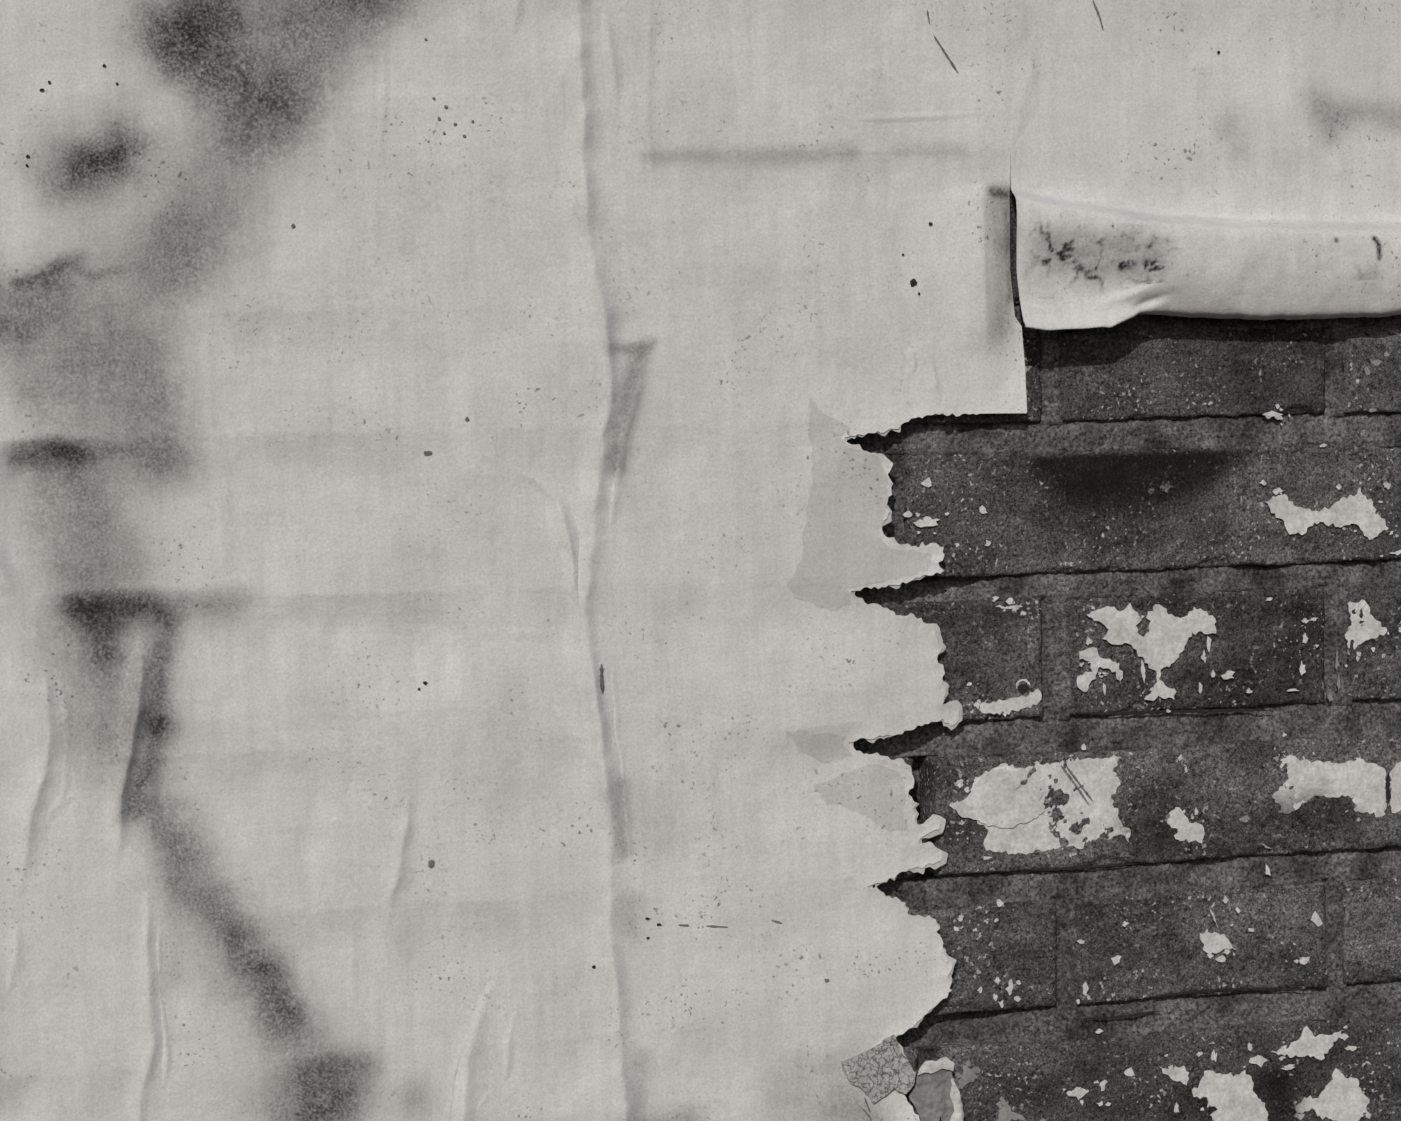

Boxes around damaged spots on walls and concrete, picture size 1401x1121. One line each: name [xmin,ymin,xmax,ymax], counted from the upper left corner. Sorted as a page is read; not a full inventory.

peeling [902,510,949,534]
peeling [1260,480,1393,540]
peeling [1076,603,1235,713]
peeling [1327,599,1401,701]
peeling [967,679,1042,717]
peeling [949,744,1131,860]
peeling [1160,807,1207,848]
peeling [1272,752,1401,821]
peeling [1199,895,1254,962]
peeling [977,977,1021,1008]
peeling [1063,1080,1111,1106]
peeling [1159,1025,1371,1121]